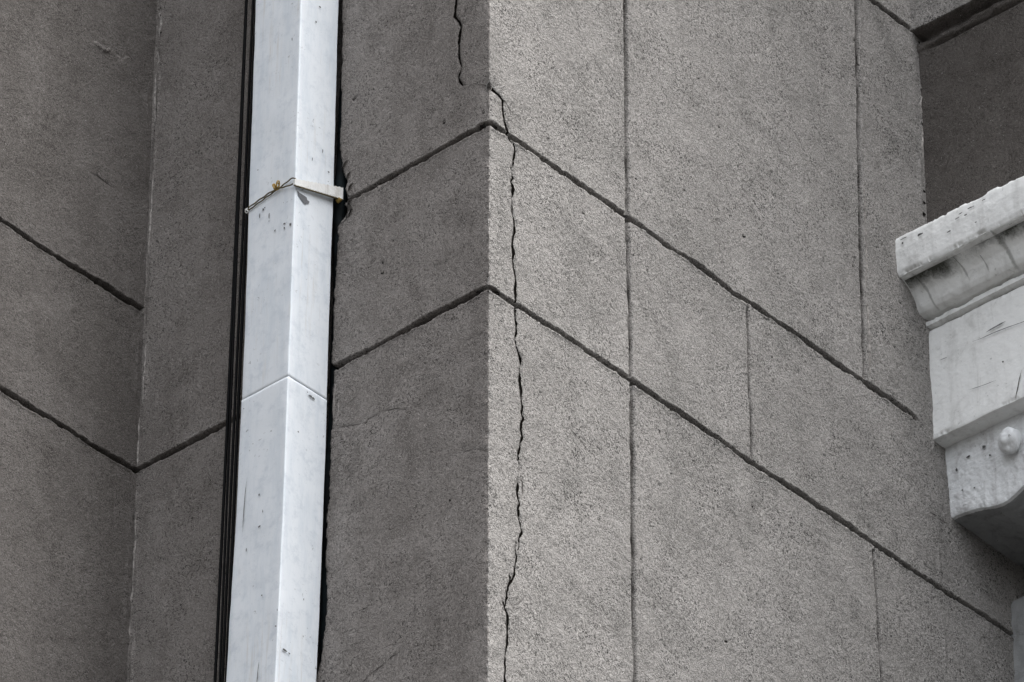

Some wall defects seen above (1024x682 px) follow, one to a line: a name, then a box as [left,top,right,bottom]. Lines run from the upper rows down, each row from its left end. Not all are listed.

crack [453,0,525,682]